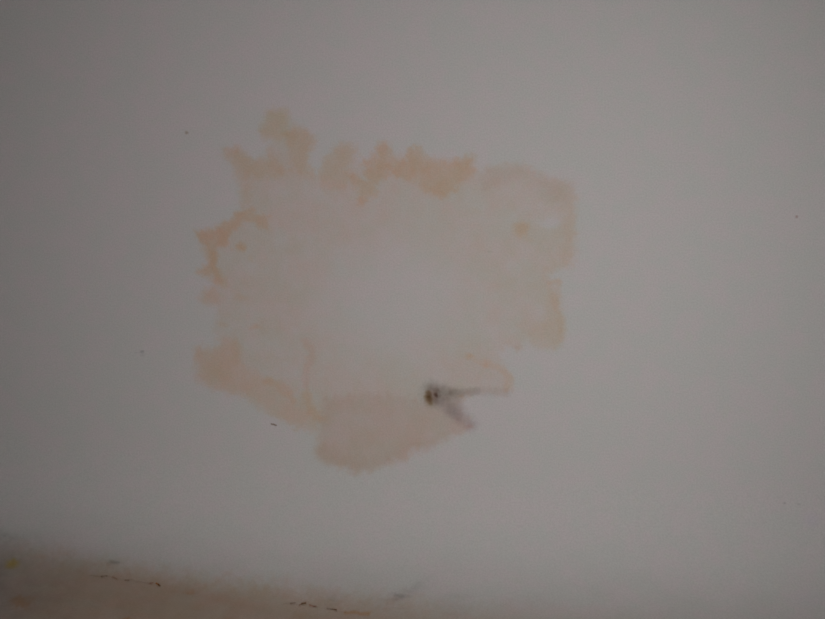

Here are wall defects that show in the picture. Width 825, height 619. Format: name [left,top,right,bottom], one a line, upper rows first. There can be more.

water stain [186,101,585,480]